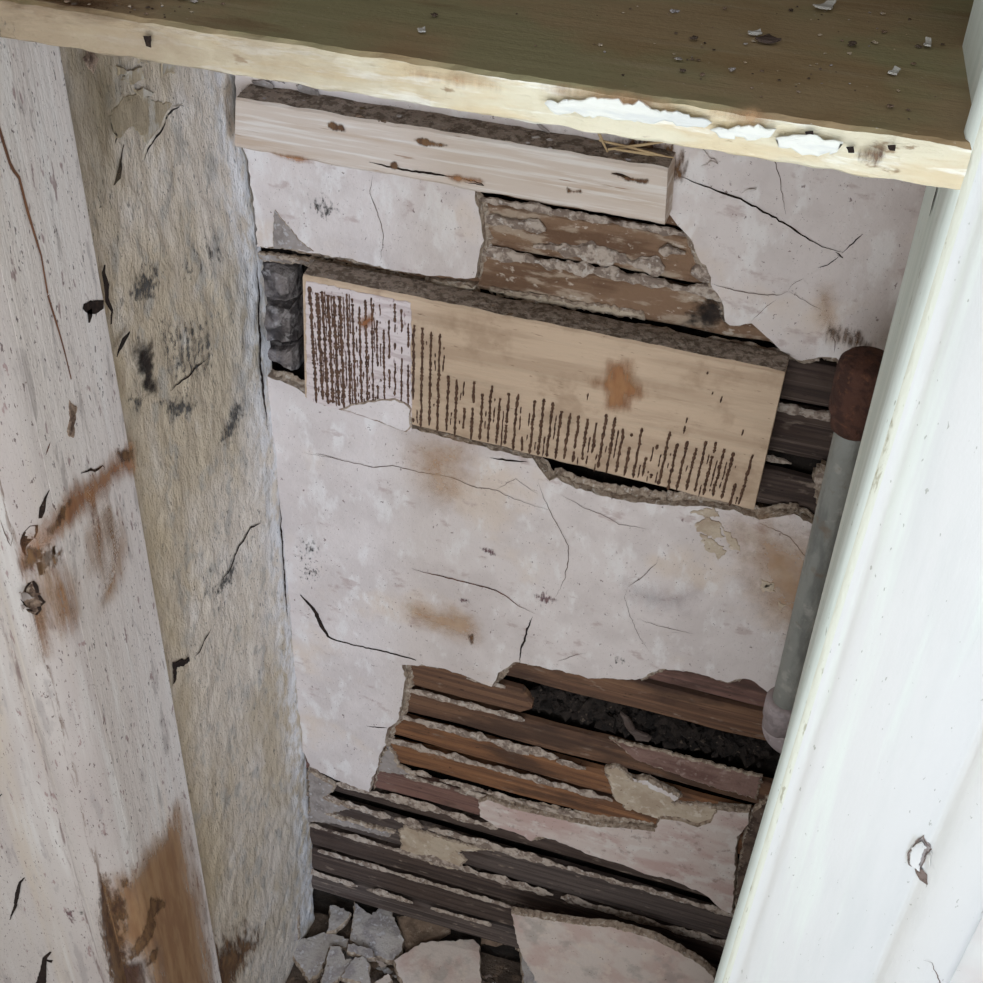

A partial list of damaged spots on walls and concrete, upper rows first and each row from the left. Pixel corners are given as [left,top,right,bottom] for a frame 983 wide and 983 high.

leakage [46,0,106,15]
peeling [545,91,843,156]
spalling [258,175,748,331]
crack [683,162,863,318]
spalling [777,403,831,422]
corrosion [23,444,135,593]
crack [222,503,415,660]
crack [414,569,532,663]
crack [311,453,644,597]
spalling [540,457,740,559]
spalling [306,662,769,947]
leakage [99,810,260,983]